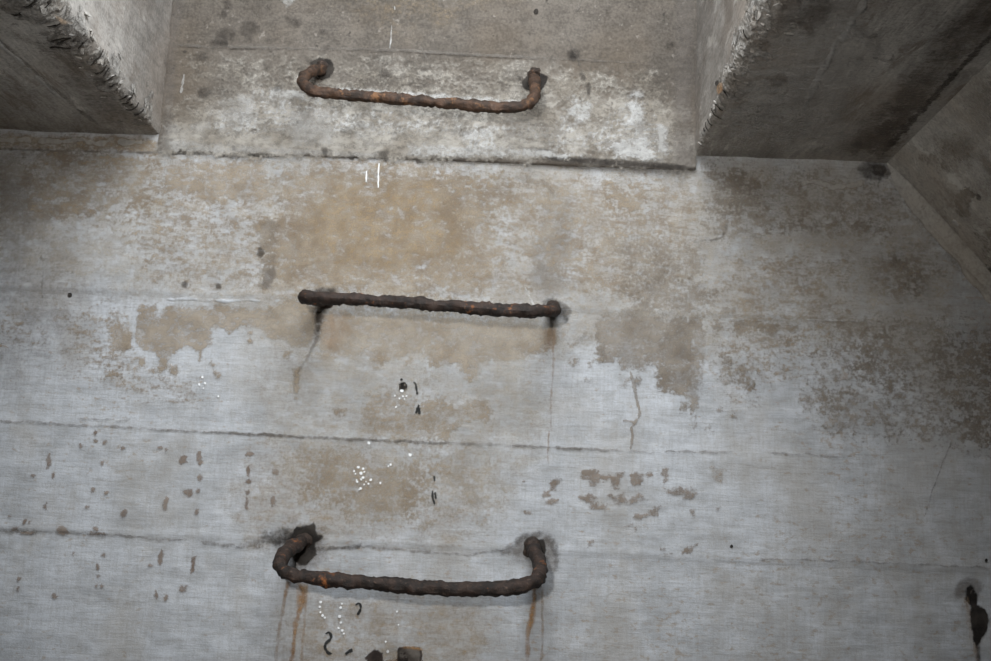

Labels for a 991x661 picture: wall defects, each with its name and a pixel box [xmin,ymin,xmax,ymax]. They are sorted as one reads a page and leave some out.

spalling [0,0,154,126]
spalling [697,0,797,146]